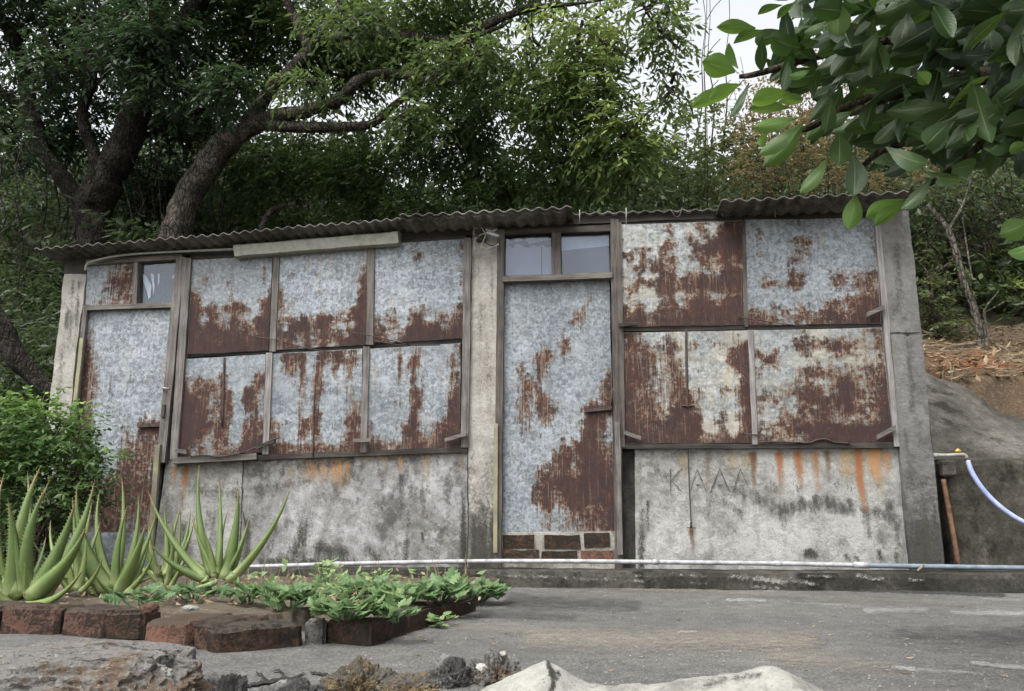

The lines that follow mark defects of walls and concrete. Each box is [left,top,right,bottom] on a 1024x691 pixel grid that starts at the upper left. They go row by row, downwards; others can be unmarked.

rust [72,263,160,531]
rust [173,240,463,498]
rust [514,220,893,532]
leakage [715,487,941,571]